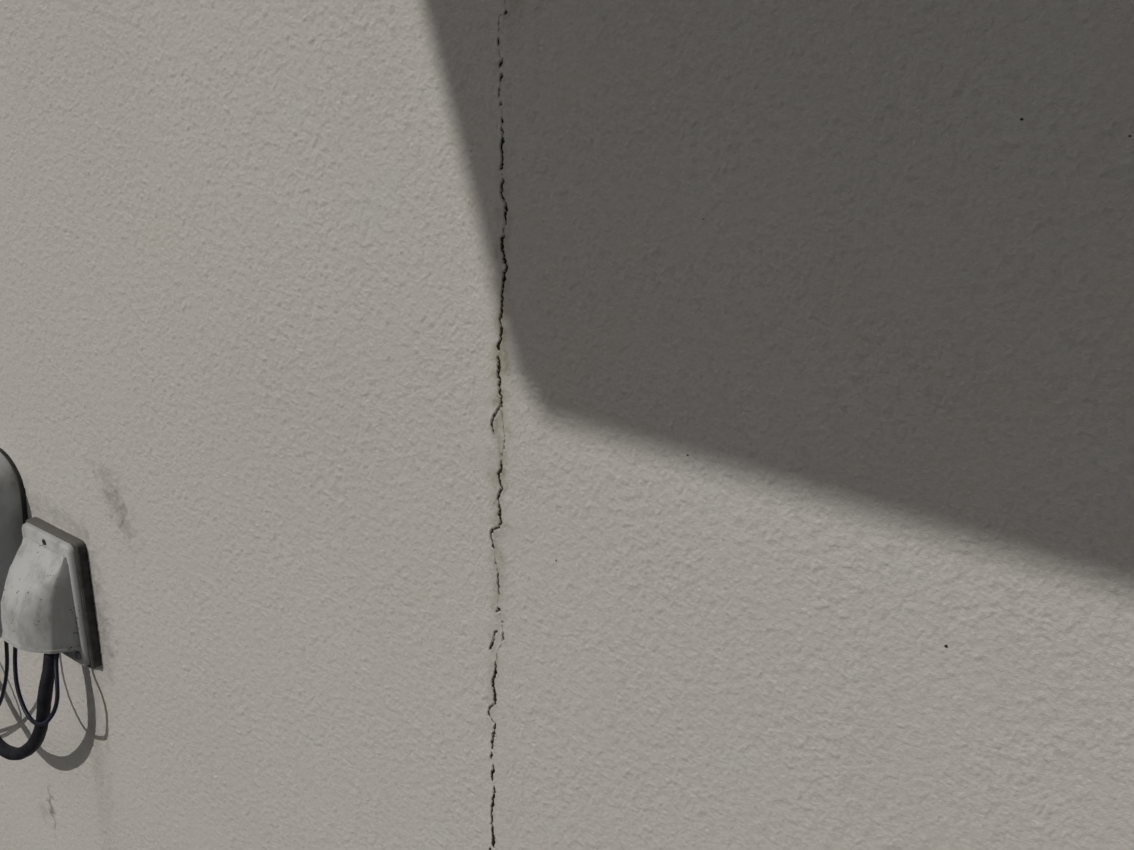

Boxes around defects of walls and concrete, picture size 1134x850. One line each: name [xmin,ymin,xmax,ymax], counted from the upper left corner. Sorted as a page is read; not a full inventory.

crack [488,11,508,850]